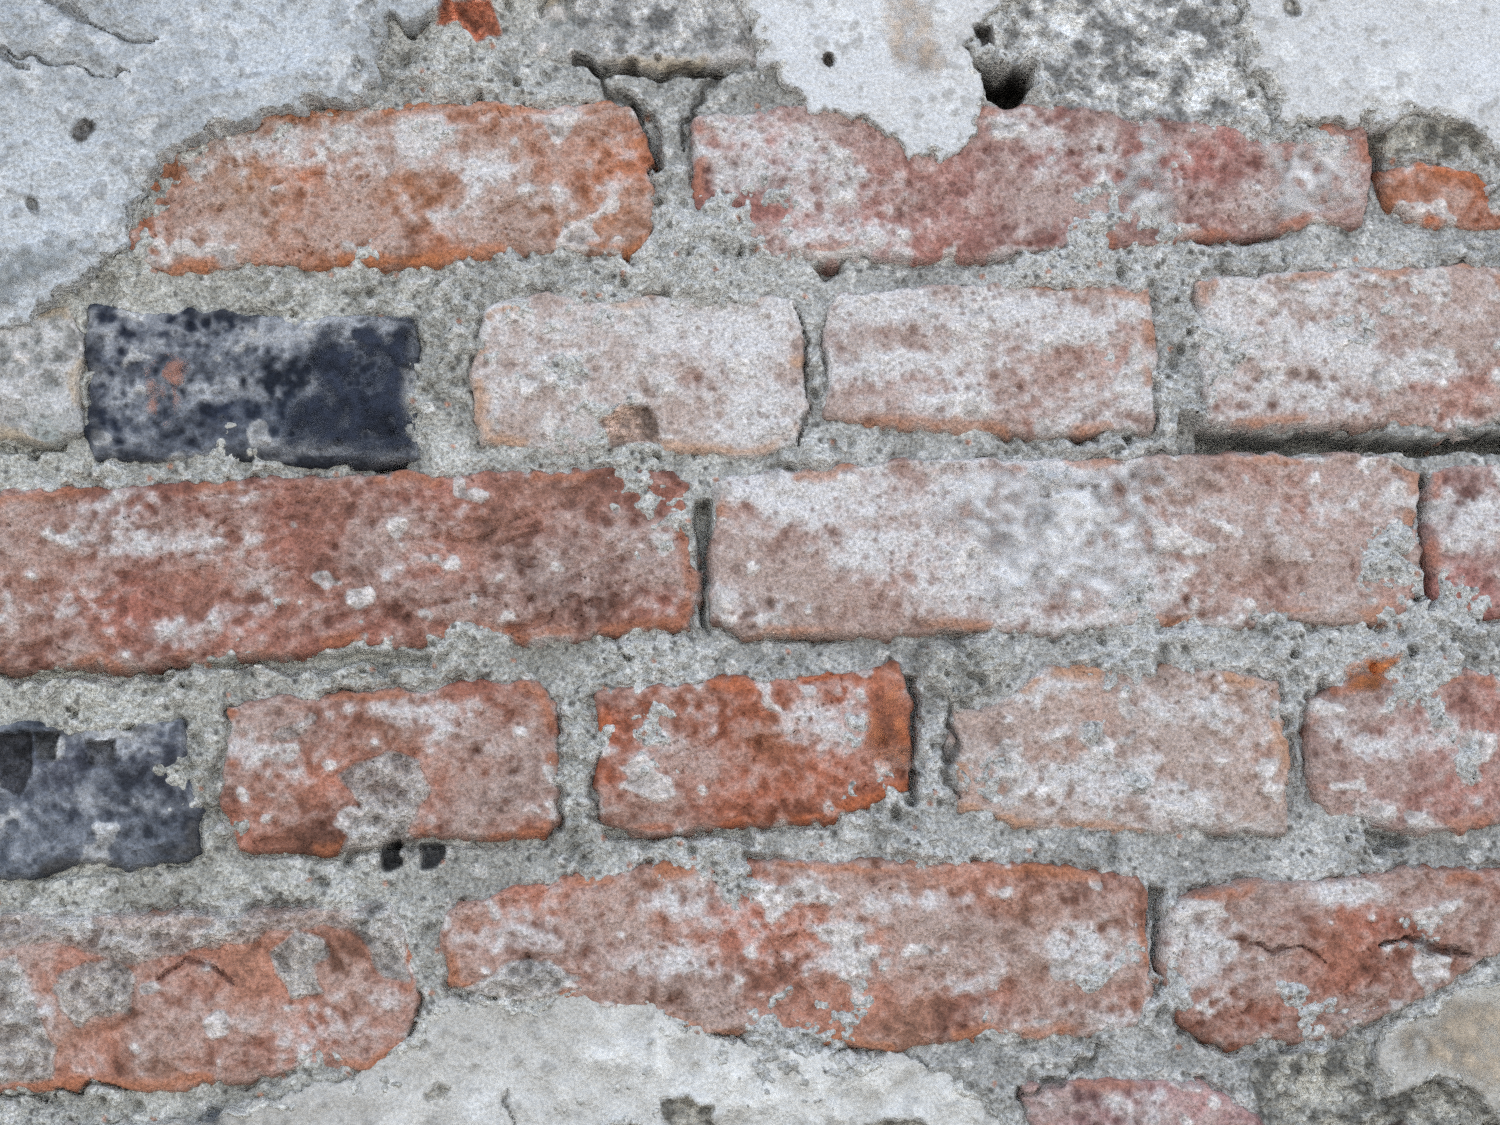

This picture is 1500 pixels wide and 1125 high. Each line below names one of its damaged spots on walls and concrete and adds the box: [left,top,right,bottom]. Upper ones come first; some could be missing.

flaking render [565,0,1500,196]
flaking render [0,0,503,330]
spalling [597,403,662,453]
spalling [0,729,62,798]
spalling [85,738,117,768]
spalling [379,838,448,873]
crack [1248,939,1327,964]
crack [1378,934,1475,960]
flaking render [110,988,1009,1125]
flaking render [1246,977,1500,1125]